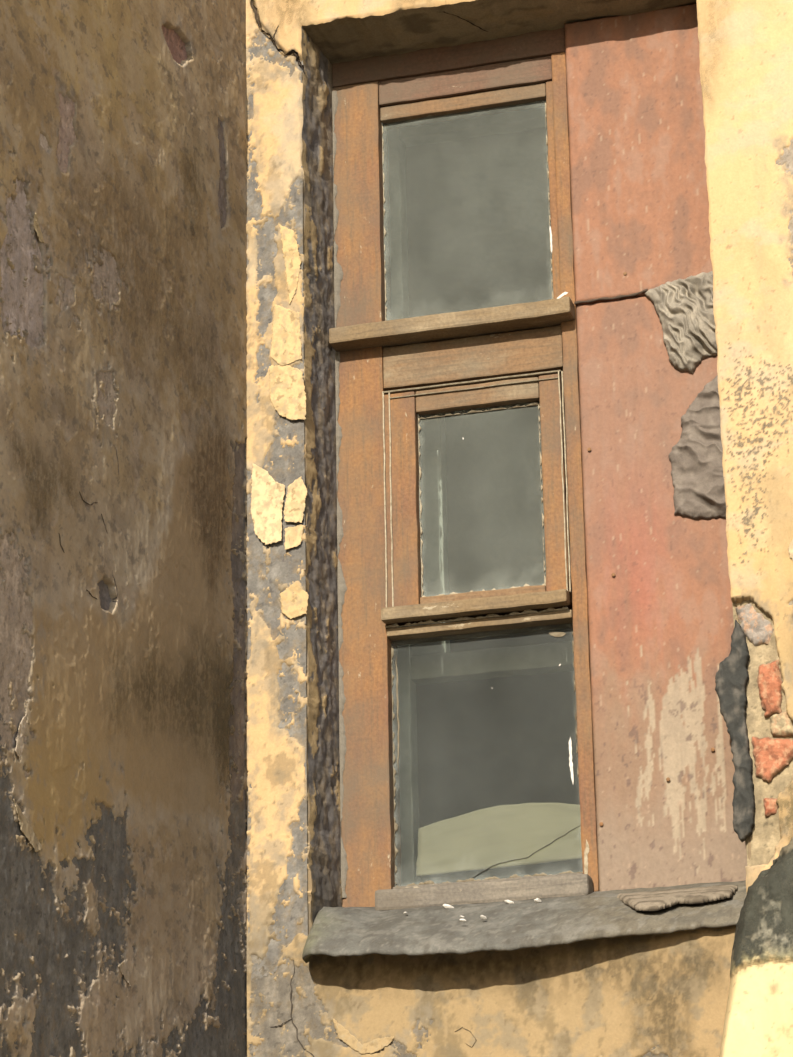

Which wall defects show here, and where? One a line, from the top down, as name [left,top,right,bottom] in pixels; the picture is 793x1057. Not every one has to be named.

flaking render [162,25,187,64]
crack [250,0,305,71]
peeling [776,139,793,175]
peeling [0,179,50,348]
peeling [75,241,127,314]
peeling [112,31,434,1057]
flaking render [0,525,143,1057]
flaking render [732,600,793,866]